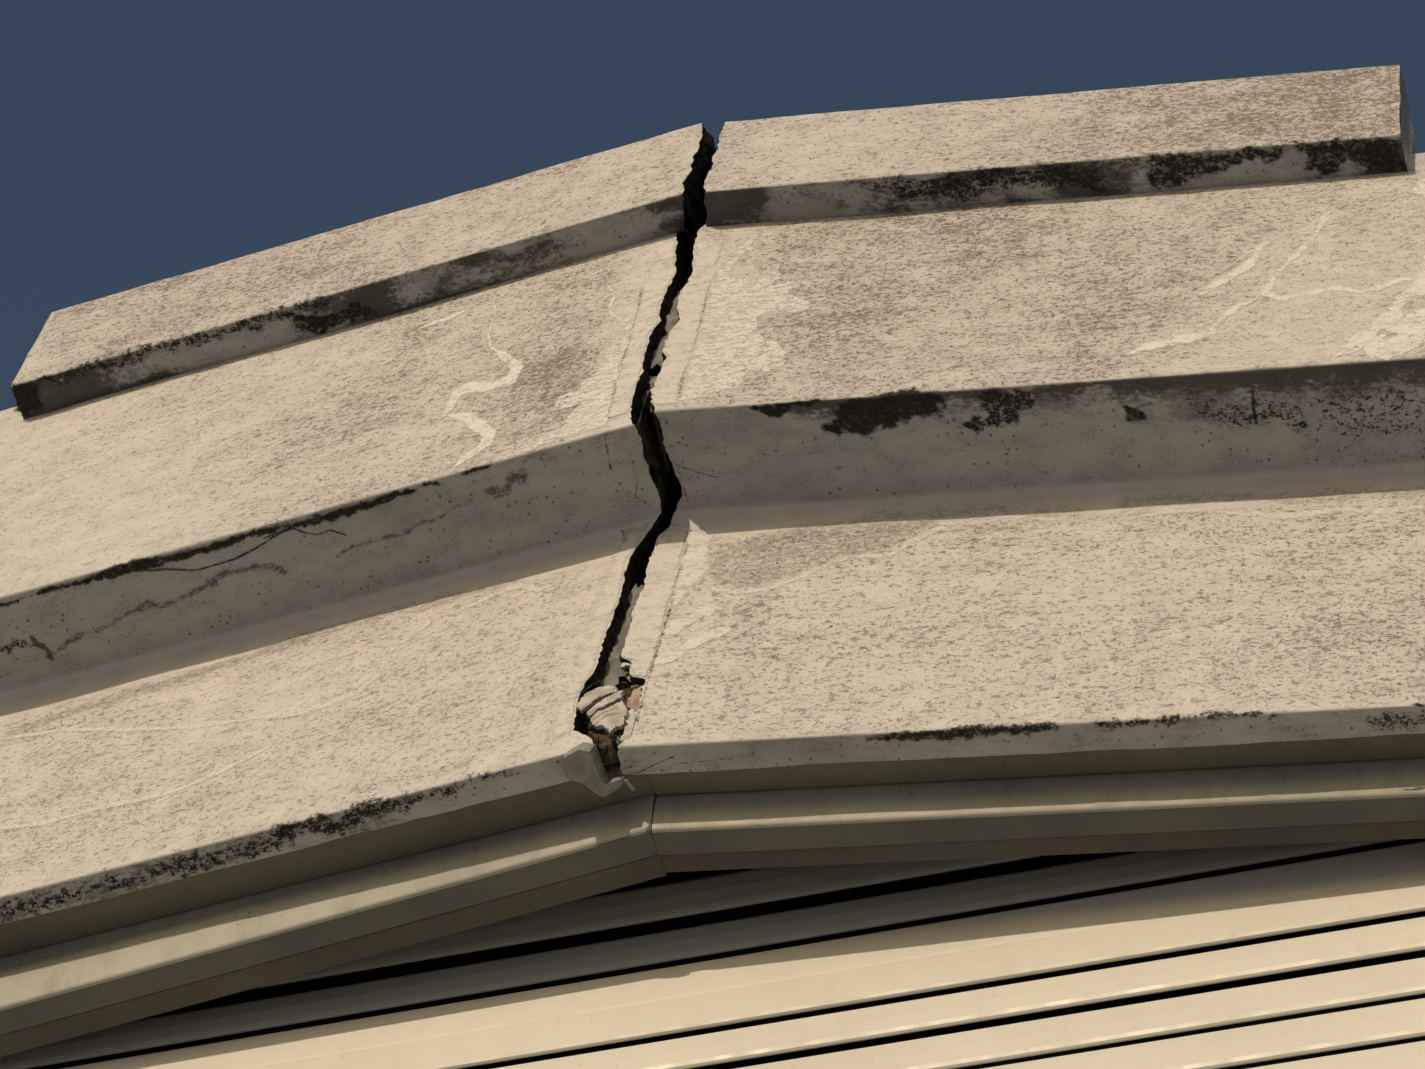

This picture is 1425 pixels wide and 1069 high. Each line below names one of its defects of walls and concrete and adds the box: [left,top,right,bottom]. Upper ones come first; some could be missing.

damp [851,162,1106,202]
damp [1146,137,1407,190]
damp [1124,207,1425,360]
damp [441,301,524,475]
damp [750,387,946,436]
damp [0,482,440,607]
crack [147,523,346,572]
crack [563,223,731,775]
spalling [563,662,642,798]
damp [868,722,1058,742]
damp [1096,711,1274,730]
damp [0,770,509,921]